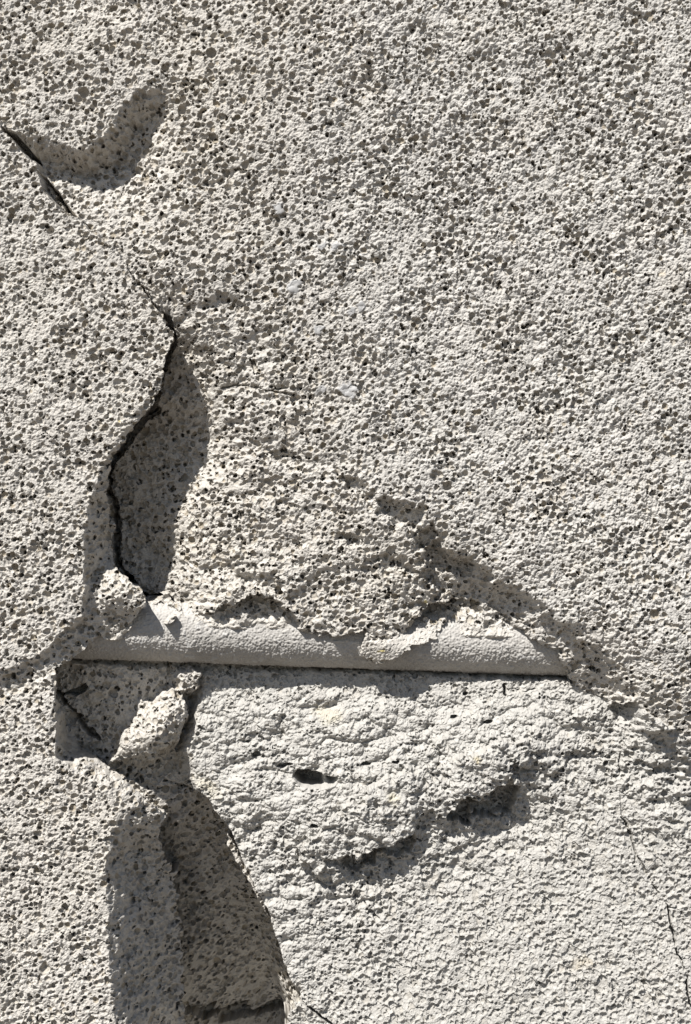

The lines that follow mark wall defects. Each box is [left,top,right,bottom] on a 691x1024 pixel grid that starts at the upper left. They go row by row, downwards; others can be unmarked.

crack [0,124,178,598]
spalling [54,261,691,1024]